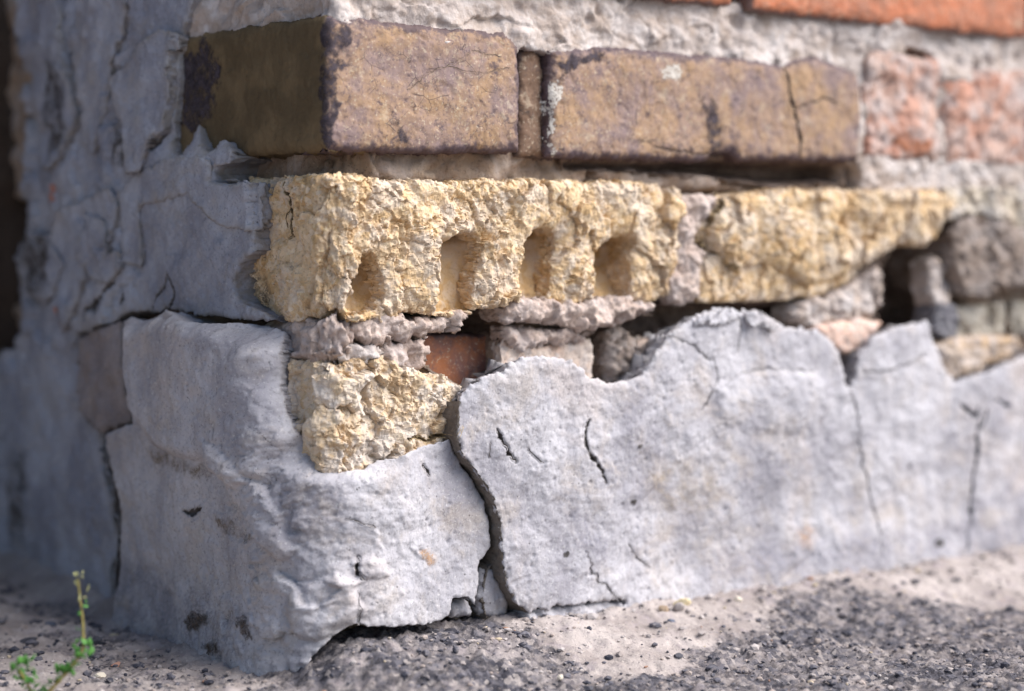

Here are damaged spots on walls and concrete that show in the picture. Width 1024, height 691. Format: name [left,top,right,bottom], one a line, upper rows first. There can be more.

crack [781,61,839,156]
crack [282,176,294,238]
spalling [13,0,957,370]
spalling [286,355,462,473]
crack [409,401,545,620]
crack [584,420,608,484]
crack [847,353,926,559]
crack [960,399,1010,550]